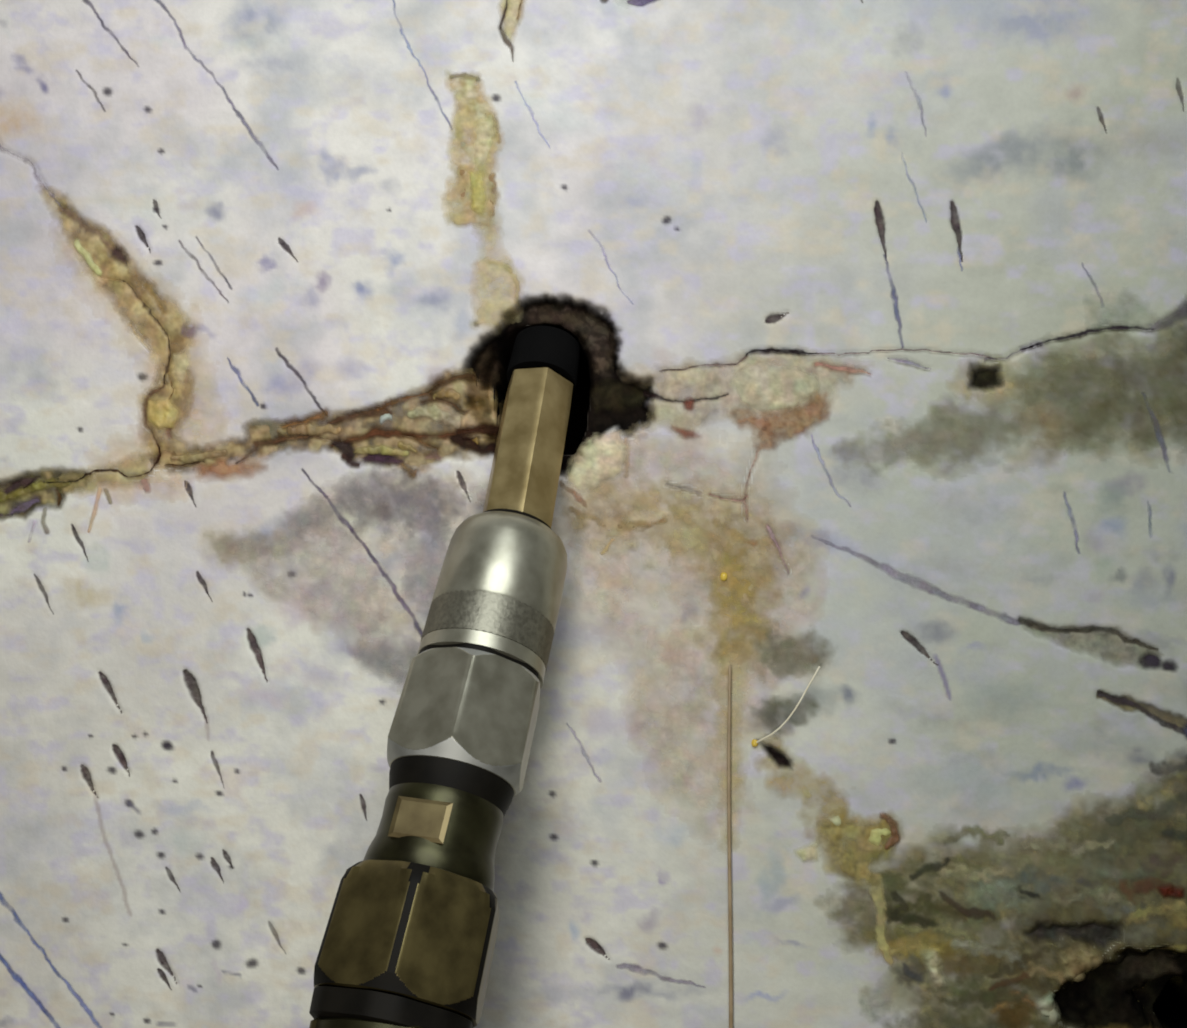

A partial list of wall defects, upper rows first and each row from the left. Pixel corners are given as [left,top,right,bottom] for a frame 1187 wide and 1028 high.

crack [0,145,504,541]
spalling [467,298,653,473]
crack [568,433,626,488]
crack [643,307,1187,572]
damp [887,316,1187,460]
damp [561,438,825,804]
damp [798,761,1187,1028]
spalling [1028,923,1187,1028]